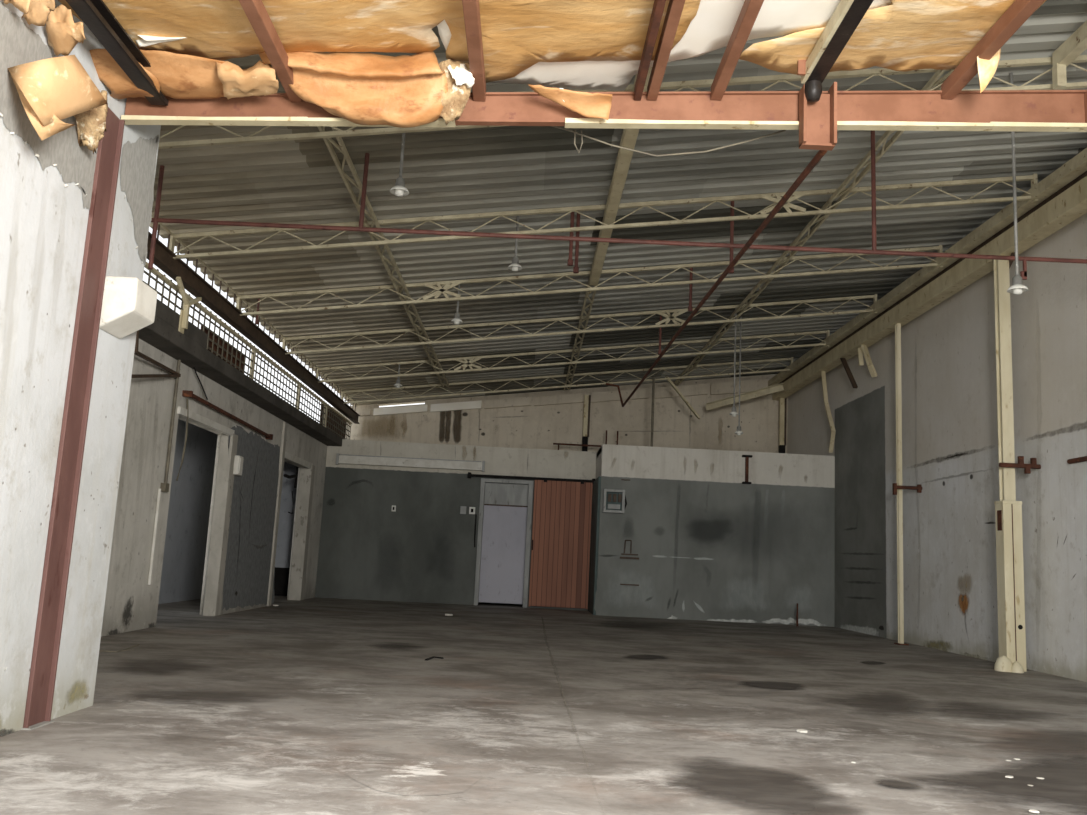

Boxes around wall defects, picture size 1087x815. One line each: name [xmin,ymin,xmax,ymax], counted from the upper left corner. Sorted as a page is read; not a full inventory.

peeling [0,1,98,209]
peeling [120,135,159,265]
corrosion [958,594,969,613]